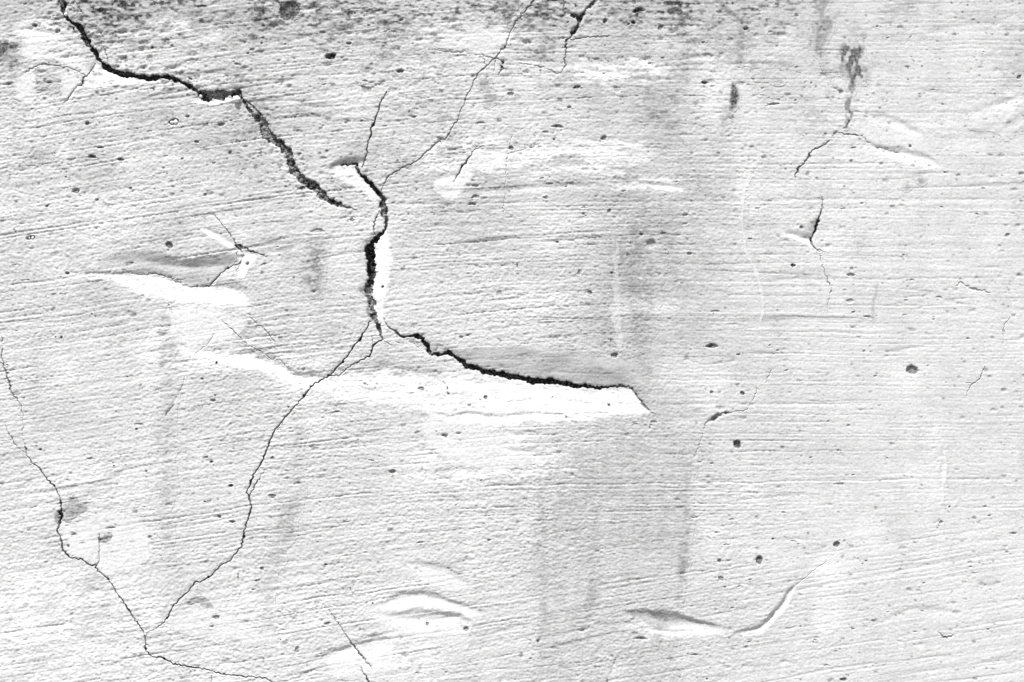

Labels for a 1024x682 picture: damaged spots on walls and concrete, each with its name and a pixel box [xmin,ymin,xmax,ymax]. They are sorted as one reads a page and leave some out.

damp [807,0,859,131]
crack [793,120,900,179]
crack [808,195,834,310]
crack [0,0,658,682]